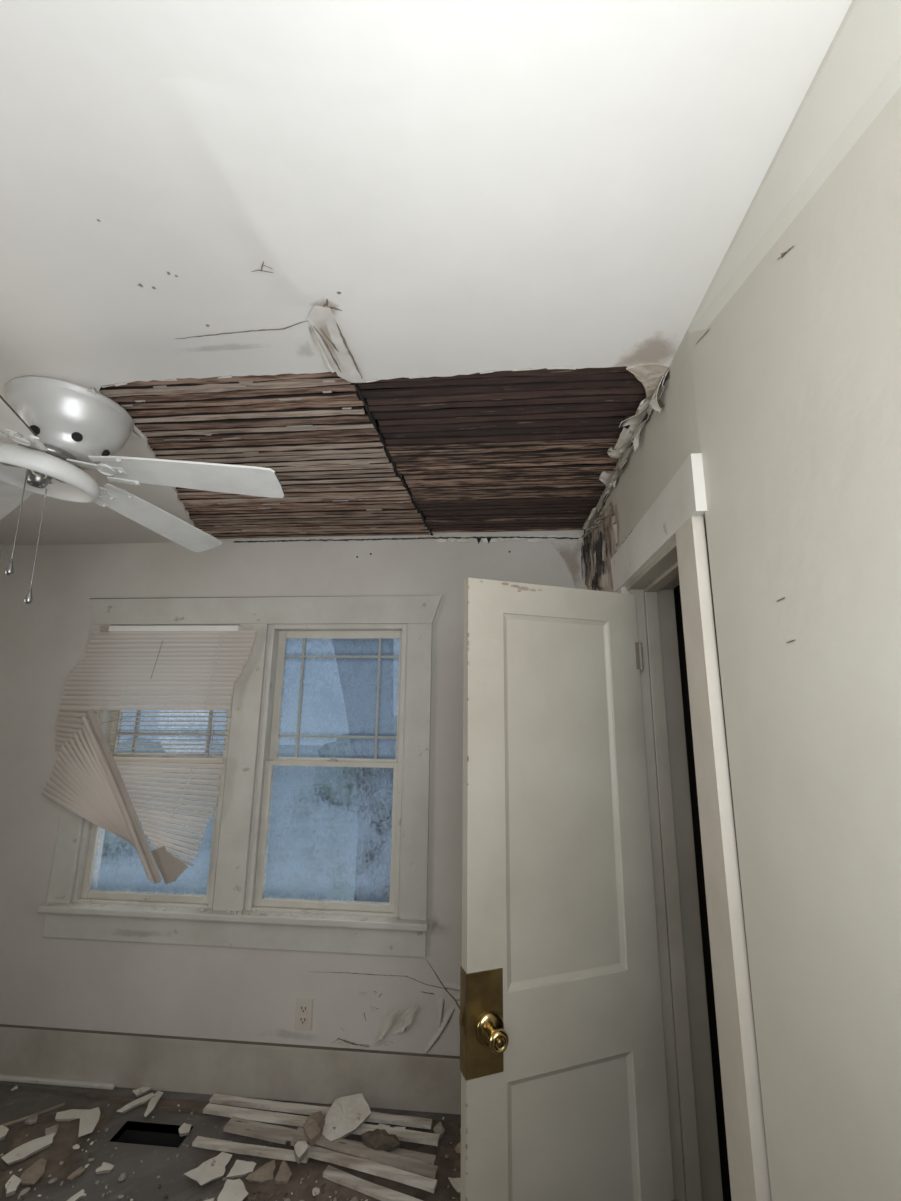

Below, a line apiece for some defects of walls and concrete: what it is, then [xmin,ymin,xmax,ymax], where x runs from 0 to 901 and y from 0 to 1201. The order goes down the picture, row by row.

crack [177,299,342,339]
flaking render [233,368,670,590]
crack [330,961,460,1053]